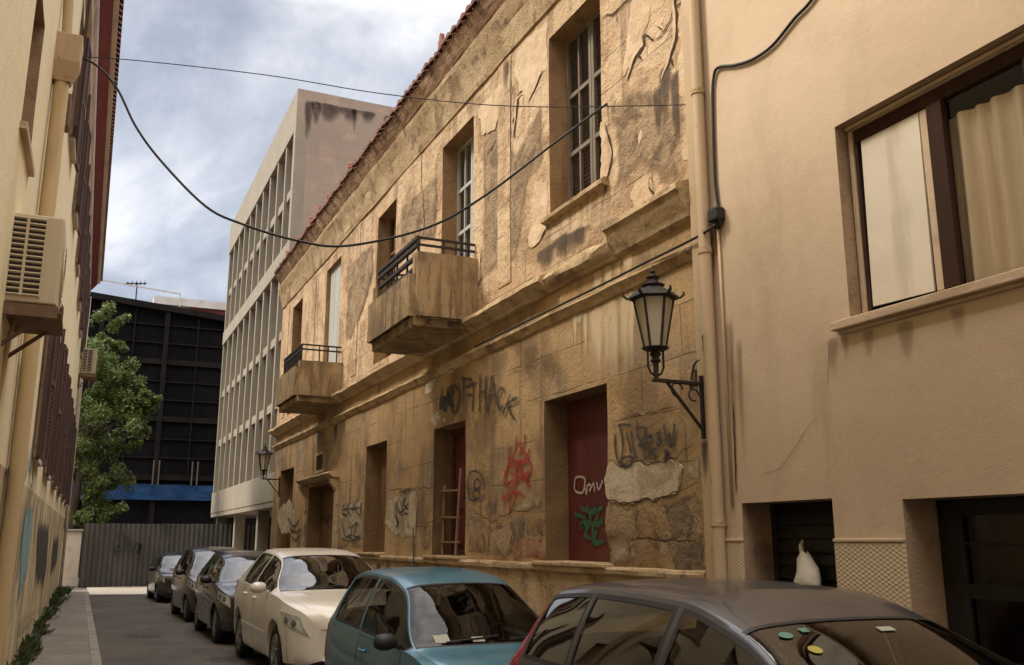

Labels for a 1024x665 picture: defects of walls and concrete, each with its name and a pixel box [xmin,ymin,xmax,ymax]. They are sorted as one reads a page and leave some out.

crack [626,0,681,79]
damp [306,102,388,126]
damp [537,226,586,264]
spalling [605,495,706,570]